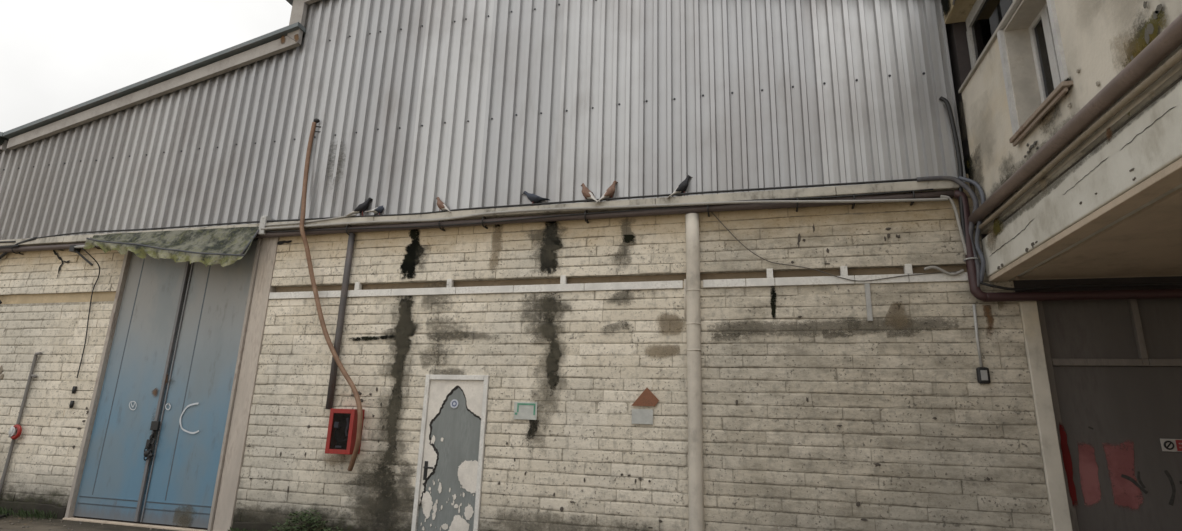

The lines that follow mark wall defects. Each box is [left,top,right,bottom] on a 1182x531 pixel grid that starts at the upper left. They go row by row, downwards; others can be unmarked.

water stain [400,229,426,279]
water stain [530,221,563,274]
water stain [347,287,488,531]
peeling [419,380,484,531]
water stain [523,292,569,440]